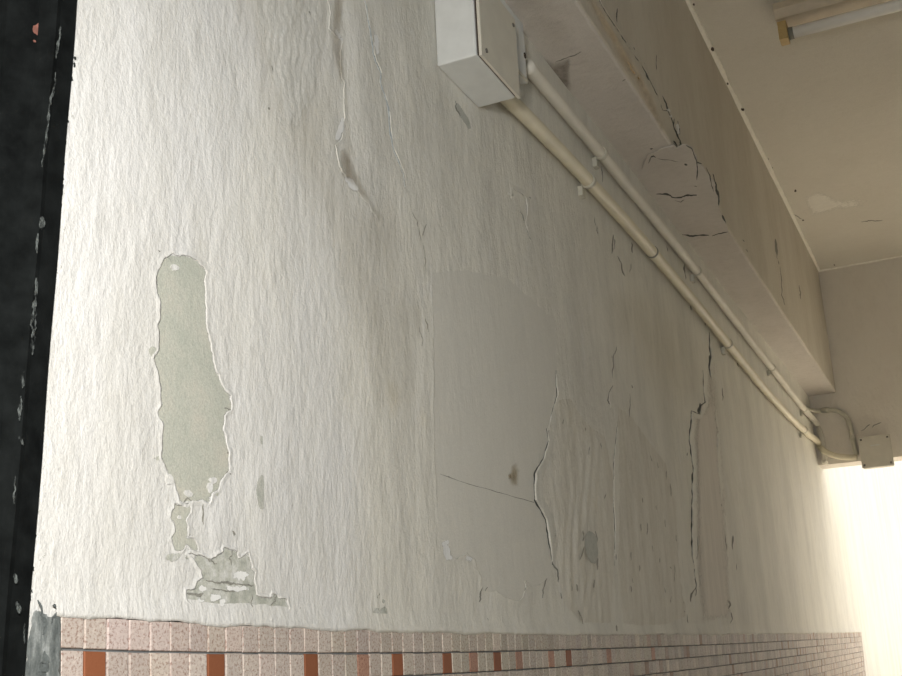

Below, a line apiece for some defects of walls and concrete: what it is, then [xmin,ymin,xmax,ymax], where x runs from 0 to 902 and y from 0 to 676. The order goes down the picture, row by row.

crack [599,0,748,252]
crack [775,239,801,305]
peeling [149,248,301,611]
crack [441,370,565,598]
crack [684,332,737,622]